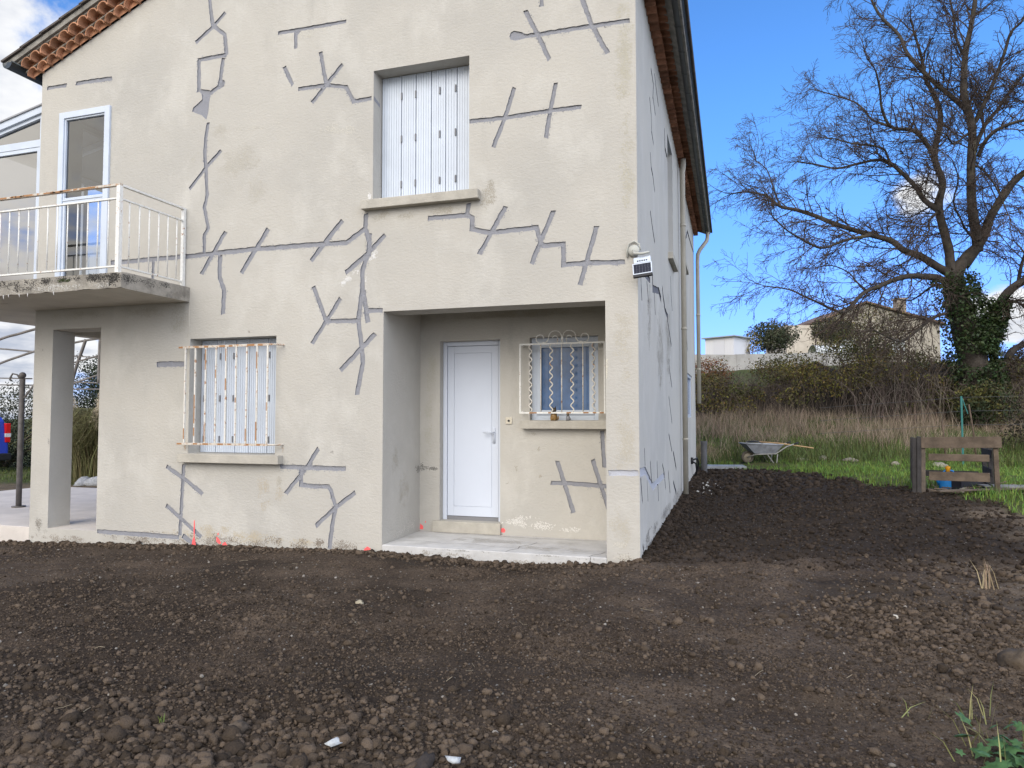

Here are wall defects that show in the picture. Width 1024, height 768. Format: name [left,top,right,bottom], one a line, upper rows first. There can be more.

crack [195,0,228,96]
crack [278,20,380,107]
crack [469,0,630,148]
leakage [0,272,169,292]
crack [111,122,386,395]
rust [177,395,231,449]
rust [179,345,236,403]
crack [428,203,688,513]
crack [97,464,204,545]
crack [280,447,356,549]